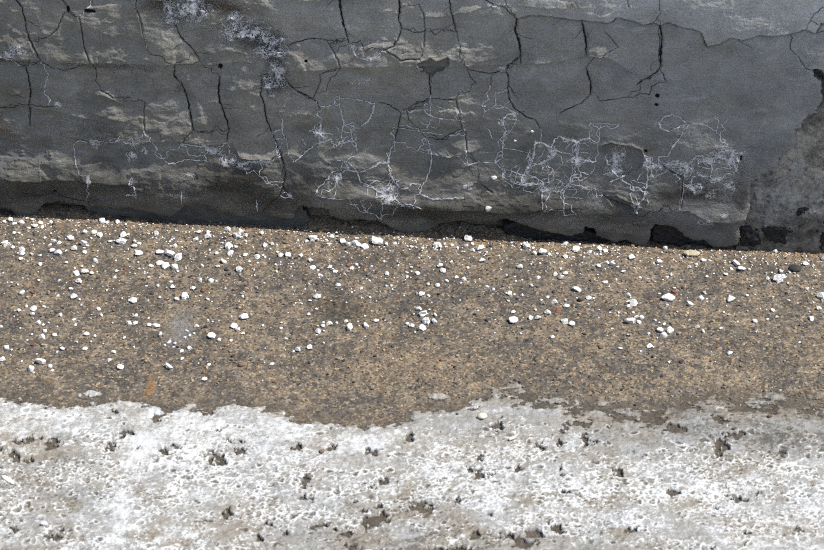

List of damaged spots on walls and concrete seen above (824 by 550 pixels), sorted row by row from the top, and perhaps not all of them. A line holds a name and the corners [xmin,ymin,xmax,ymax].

crack [1,0,237,143]
water stain [151,0,286,89]
crack [256,0,540,209]
water stain [73,85,743,220]
crack [551,0,674,112]
crack [603,165,684,217]
crack [696,7,824,75]
spalling [736,69,824,253]